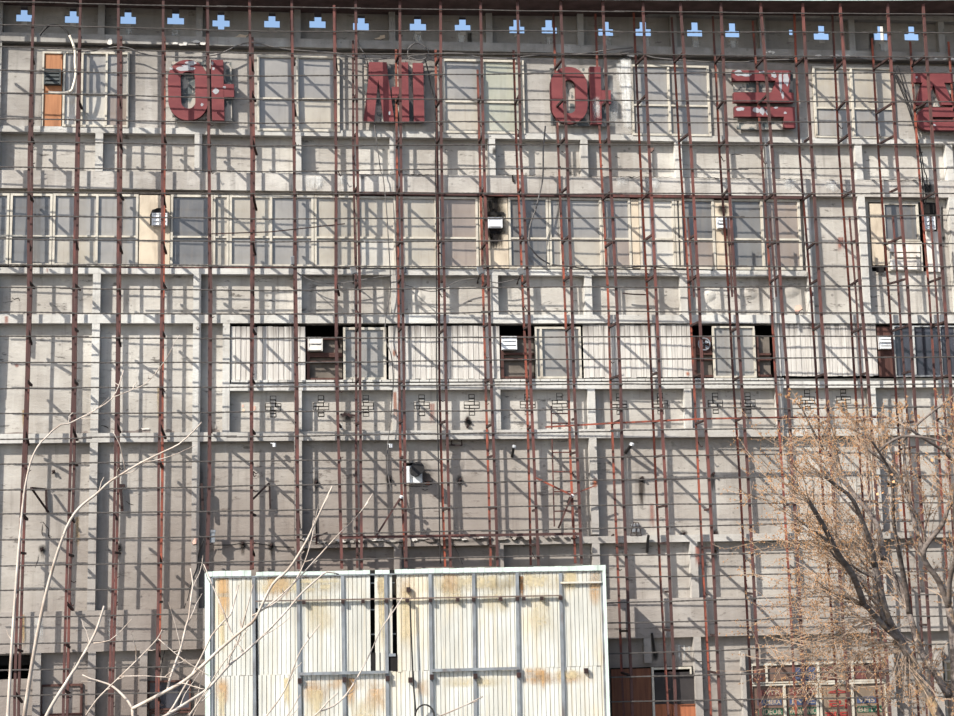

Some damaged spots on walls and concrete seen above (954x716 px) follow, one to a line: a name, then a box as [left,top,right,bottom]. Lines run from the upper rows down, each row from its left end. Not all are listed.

damp [489,232,502,247]
corrosion [219,579,229,644]